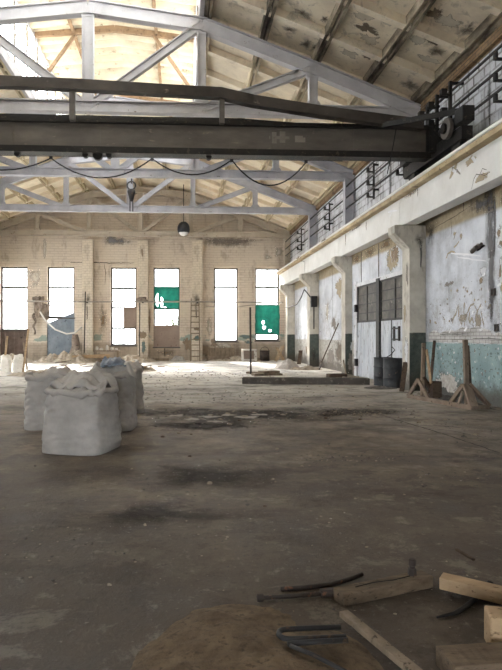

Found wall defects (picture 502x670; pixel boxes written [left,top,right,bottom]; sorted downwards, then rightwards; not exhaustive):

spalling [451,229,487,262]
peeling [385,246,408,284]
flaking render [429,281,502,393]